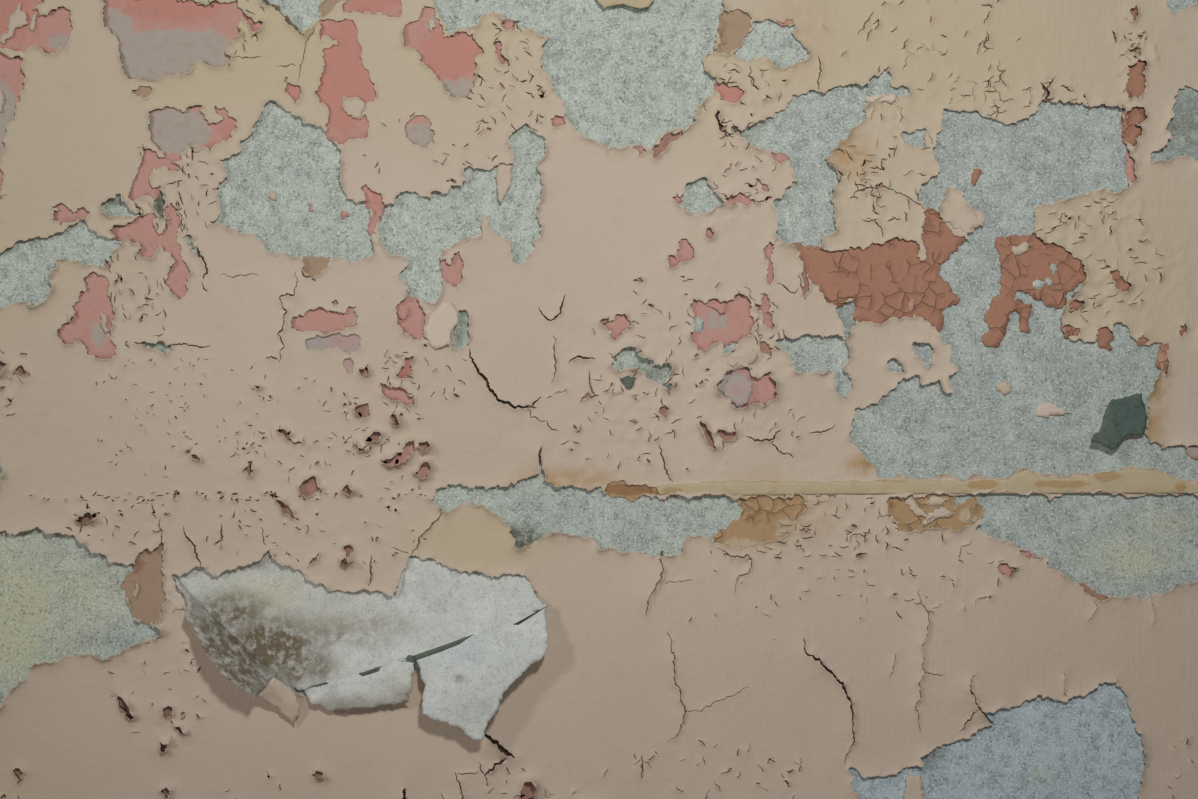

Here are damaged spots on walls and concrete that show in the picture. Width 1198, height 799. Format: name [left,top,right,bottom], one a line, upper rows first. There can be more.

peeling [0,0,1198,604]
peeling [0,490,548,740]
crack [441,734,515,799]
crack [646,550,745,738]
crack [717,548,752,593]
crack [804,641,855,756]
crack [895,594,993,732]
peeling [849,682,1146,799]